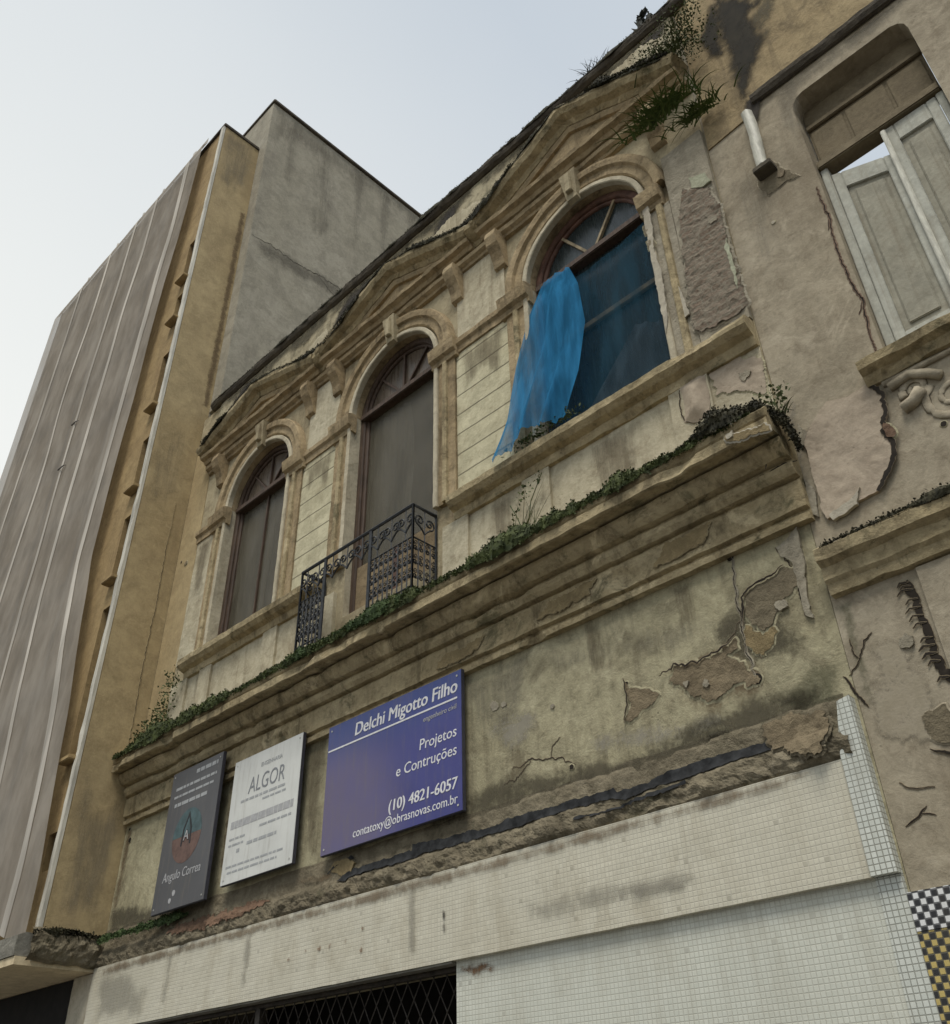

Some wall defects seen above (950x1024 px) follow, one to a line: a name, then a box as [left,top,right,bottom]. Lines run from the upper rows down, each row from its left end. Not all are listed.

damp [700,0,772,119]
flaking render [641,172,752,335]
crack [816,187,877,352]
spalling [866,385,899,491]
peeling [829,487,861,521]
crack [503,737,575,785]
flaking render [623,526,815,725]
spalling [760,708,834,760]
crack [843,632,872,707]
peeling [869,633,950,746]